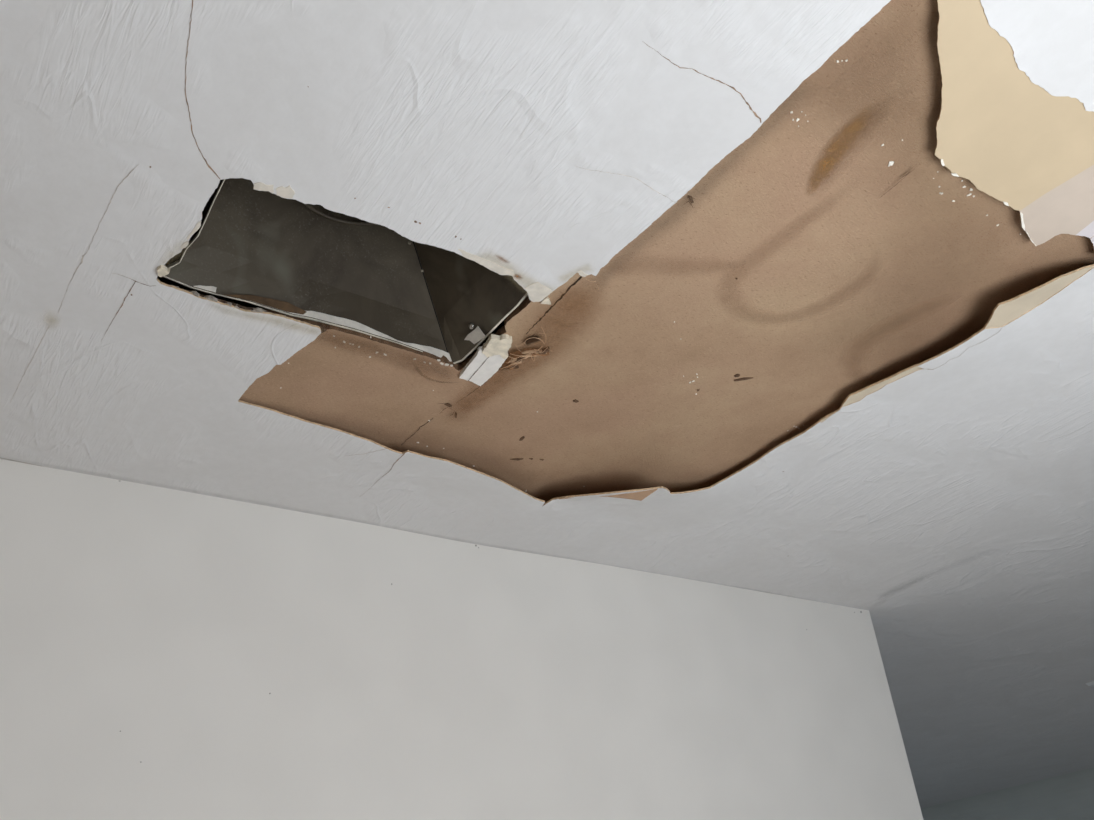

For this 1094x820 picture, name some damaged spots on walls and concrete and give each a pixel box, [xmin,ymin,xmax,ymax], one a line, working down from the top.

crack [185,0,220,179]
crack [645,43,761,123]
flaking render [160,0,1094,503]